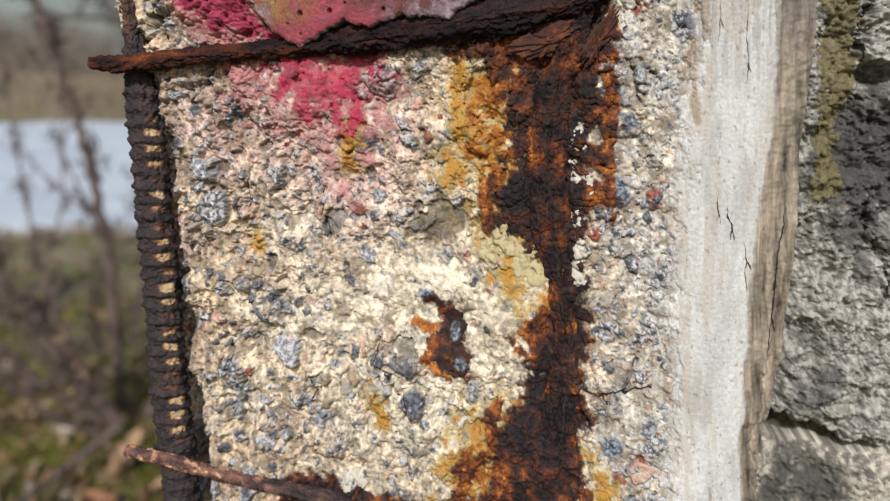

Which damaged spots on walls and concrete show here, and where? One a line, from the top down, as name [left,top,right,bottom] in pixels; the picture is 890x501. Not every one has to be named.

spalling [133,0,271,52]
corrosion [590,0,622,30]
corrosion [341,122,365,172]
spalling [148,32,551,501]
corrosion [428,25,627,501]
spalling [572,0,703,501]
corrosion [411,294,474,382]
corrosion [364,378,391,430]
corrosion [276,467,416,501]